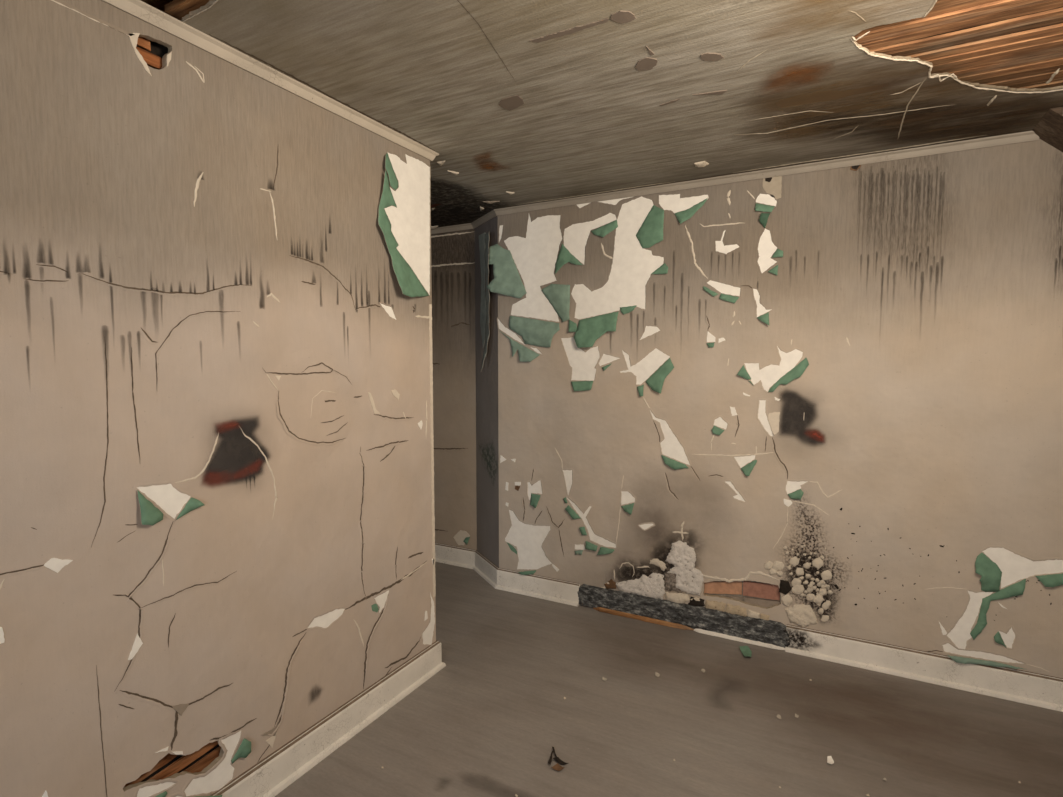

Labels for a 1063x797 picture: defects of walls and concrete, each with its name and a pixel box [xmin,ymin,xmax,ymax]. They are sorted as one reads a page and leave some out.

peeling [754,176,783,275]
crack [0,264,280,589]
crack [263,362,333,391]
peeling [378,150,459,646]
peeling [479,192,711,481]
crack [0,627,8,644]
crack [96,521,237,796]
crack [257,389,468,763]
flaking render [601,540,781,620]
leakage [764,510,845,628]
peeling [926,545,1063,672]
spalling [124,718,257,797]